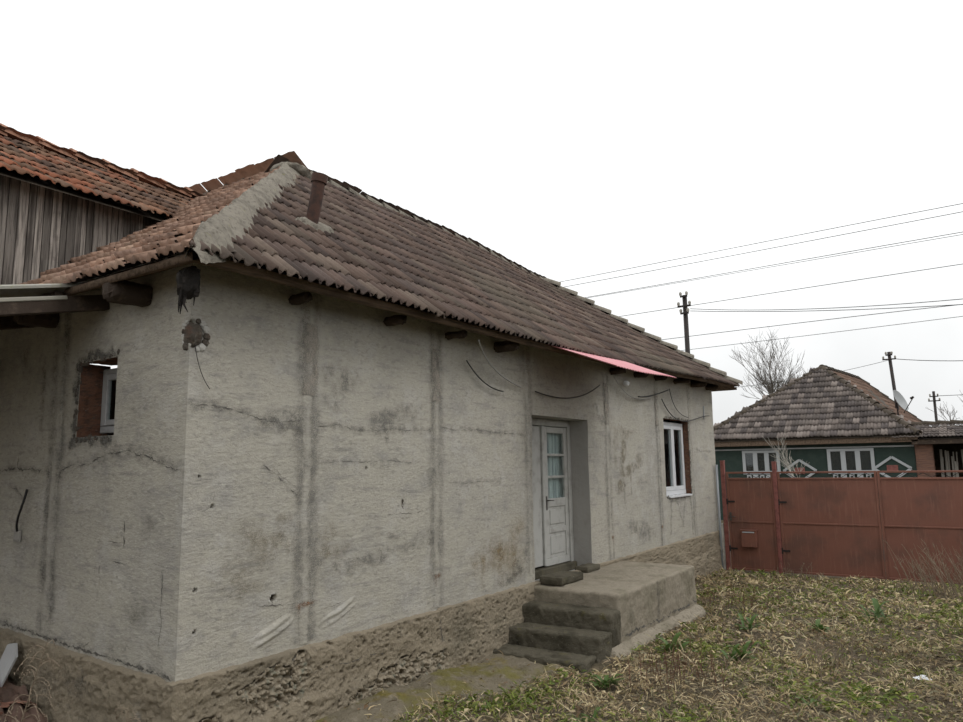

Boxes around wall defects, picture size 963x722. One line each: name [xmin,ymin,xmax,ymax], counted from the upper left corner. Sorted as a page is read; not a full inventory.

crack [0,450,178,496]
spalling [238,651,312,720]